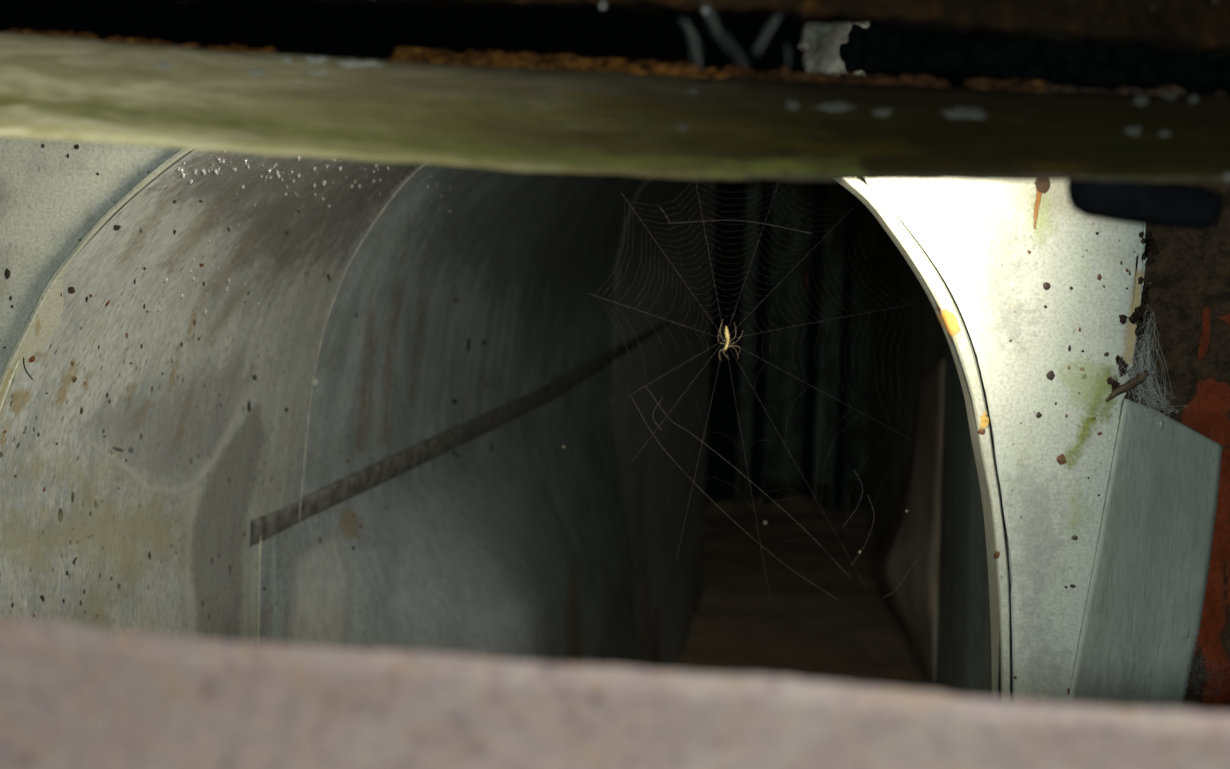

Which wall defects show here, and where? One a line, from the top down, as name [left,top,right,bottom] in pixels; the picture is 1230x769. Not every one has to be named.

leakage [1066,368,1114,467]